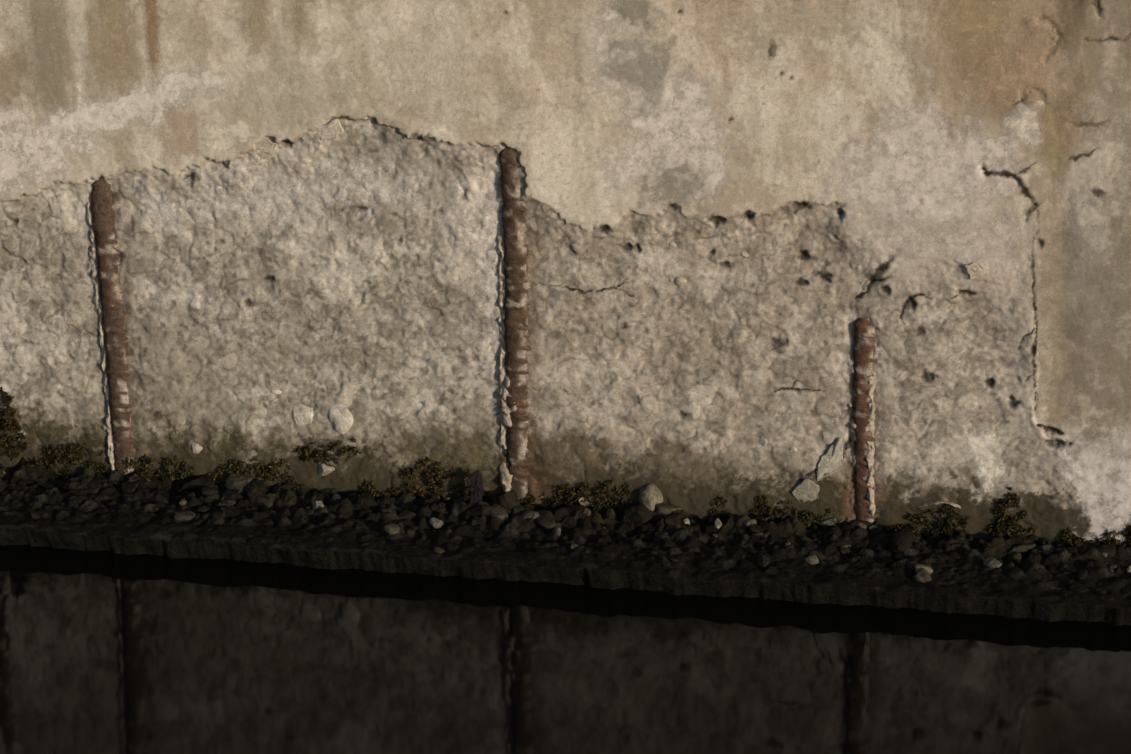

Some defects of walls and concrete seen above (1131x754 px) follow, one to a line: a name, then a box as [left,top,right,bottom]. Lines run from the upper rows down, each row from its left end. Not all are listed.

crack [1027,0,1130,54]
spalling [0,116,1080,543]
damp [826,100,1044,292]
crack [982,163,1064,435]
damp [1056,0,1131,540]
corrosion [525,418,551,509]
corrosion [835,474,856,524]
efflorescence [964,423,1006,500]